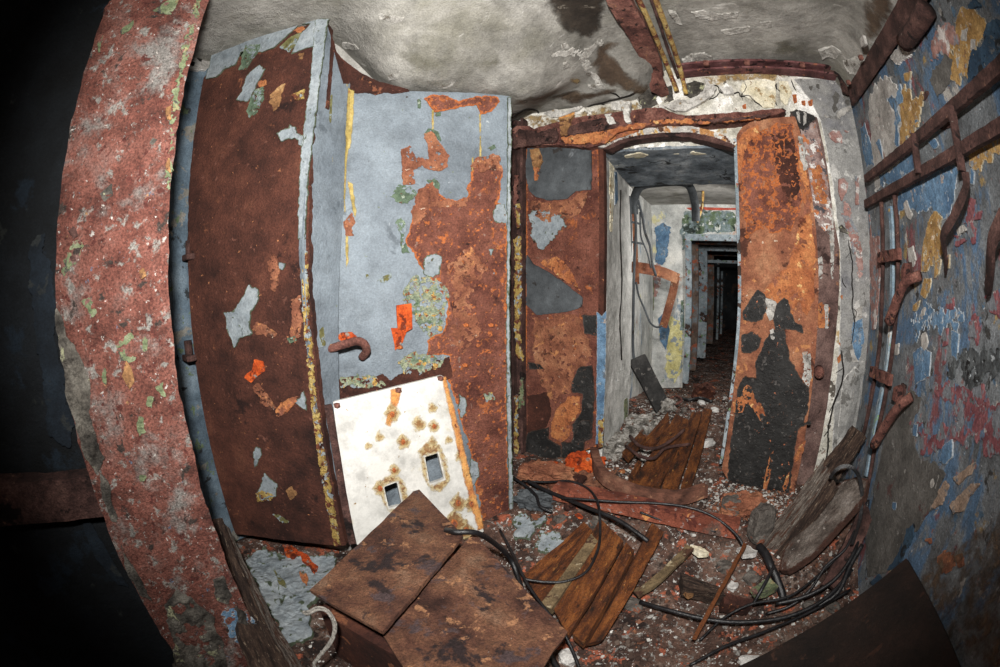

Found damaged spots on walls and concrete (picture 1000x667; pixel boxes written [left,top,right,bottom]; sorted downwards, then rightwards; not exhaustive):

water stain [550,0,604,37]
peeling [930,0,1000,86]
rust [258,80,285,111]
spalling [638,86,674,109]
spalling [685,81,705,98]
rust [267,254,280,292]
rust [289,295,304,344]
rust [338,94,509,539]
peeling [403,274,449,338]
rust [526,104,830,459]
flaking render [740,45,1000,514]
peeling [398,351,446,375]